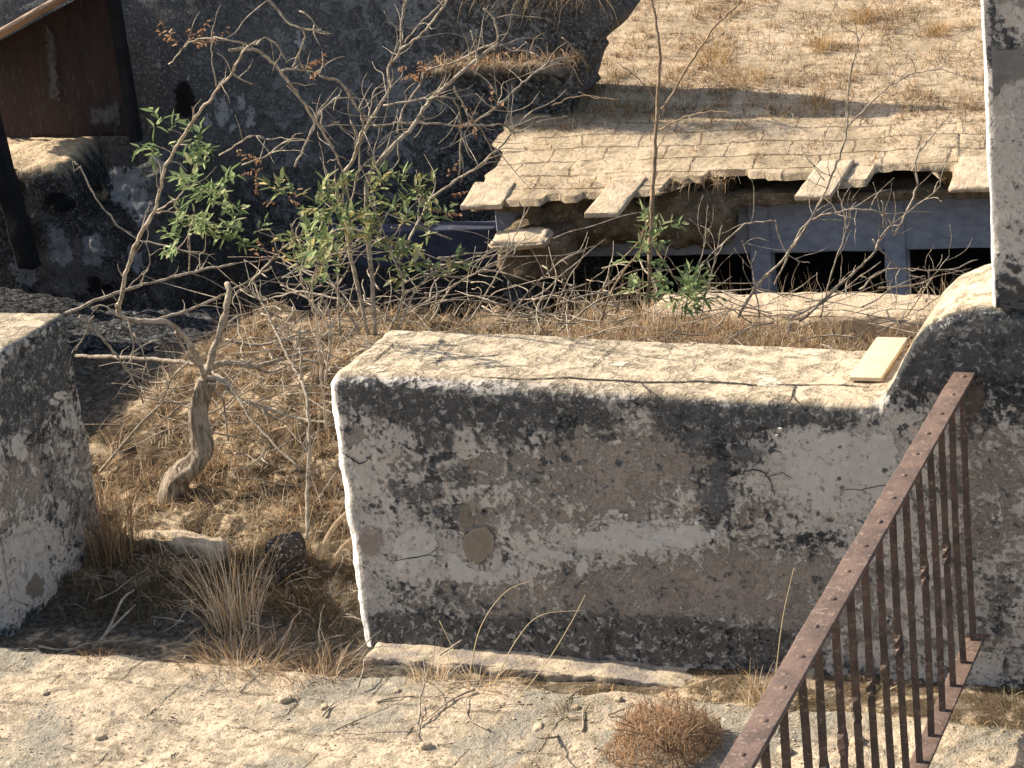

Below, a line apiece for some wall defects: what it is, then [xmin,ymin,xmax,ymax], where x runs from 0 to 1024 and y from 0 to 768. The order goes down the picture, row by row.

crack [472,344,869,404]
leakage [337,385,860,520]
crack [728,469,792,496]
flaking render [358,513,720,586]
leakage [368,610,797,670]